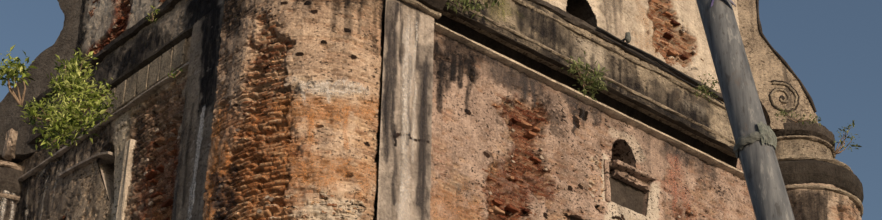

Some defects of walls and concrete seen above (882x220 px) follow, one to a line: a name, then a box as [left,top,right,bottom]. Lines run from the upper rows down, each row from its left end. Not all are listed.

spalling [86,0,131,59]
spalling [643,0,704,70]
leakage [2,119,114,220]
spalling [144,122,181,220]
spalling [212,72,365,220]
leakage [380,0,541,220]
spalling [473,100,551,220]
spalling [572,108,588,129]
peeling [568,144,605,213]